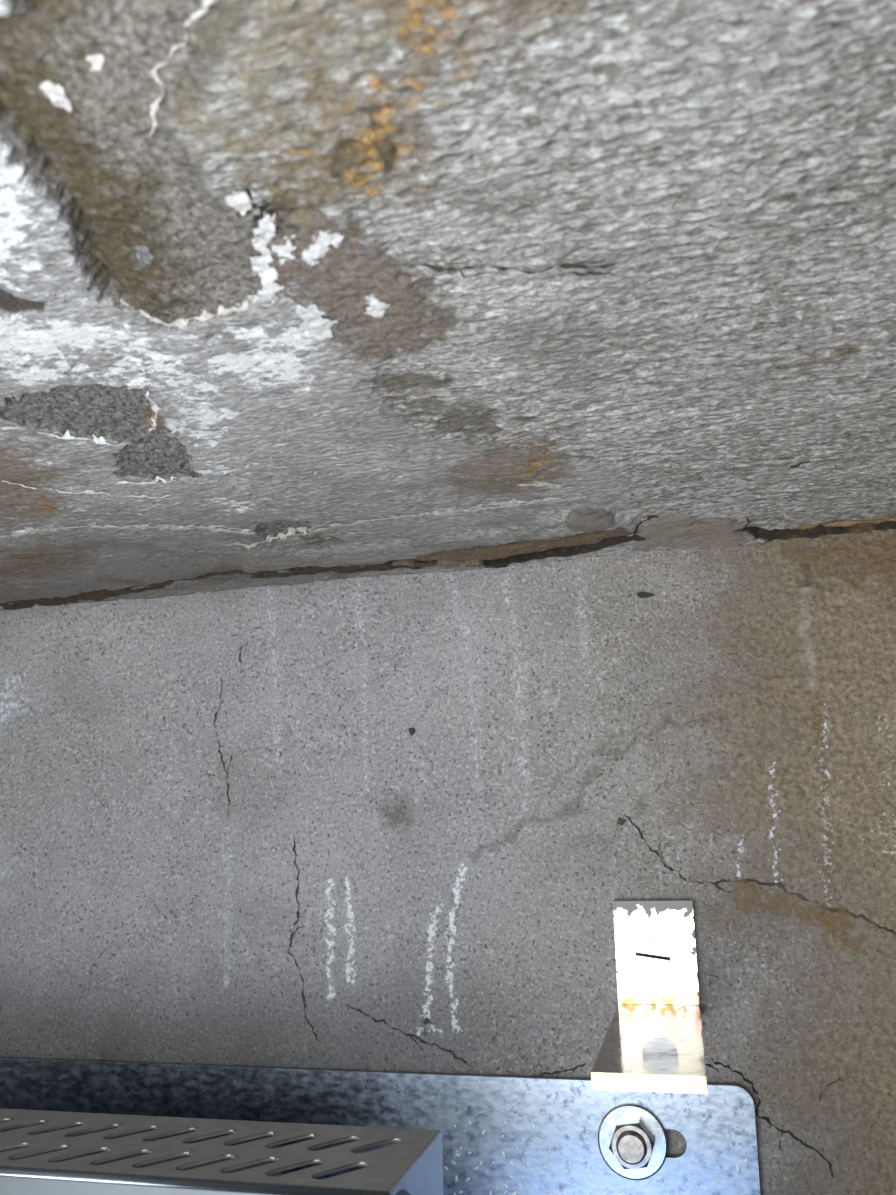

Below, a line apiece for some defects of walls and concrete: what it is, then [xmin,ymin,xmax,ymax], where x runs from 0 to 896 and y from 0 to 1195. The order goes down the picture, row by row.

rust [348,108,417,194]
spalling [0,0,588,549]
crack [0,515,658,610]
crack [737,517,896,542]
crack [214,643,243,817]
crack [622,810,896,935]
crack [288,837,320,1042]
crack [345,1004,472,1067]
crack [537,1063,586,1077]
crack [705,1061,833,1179]